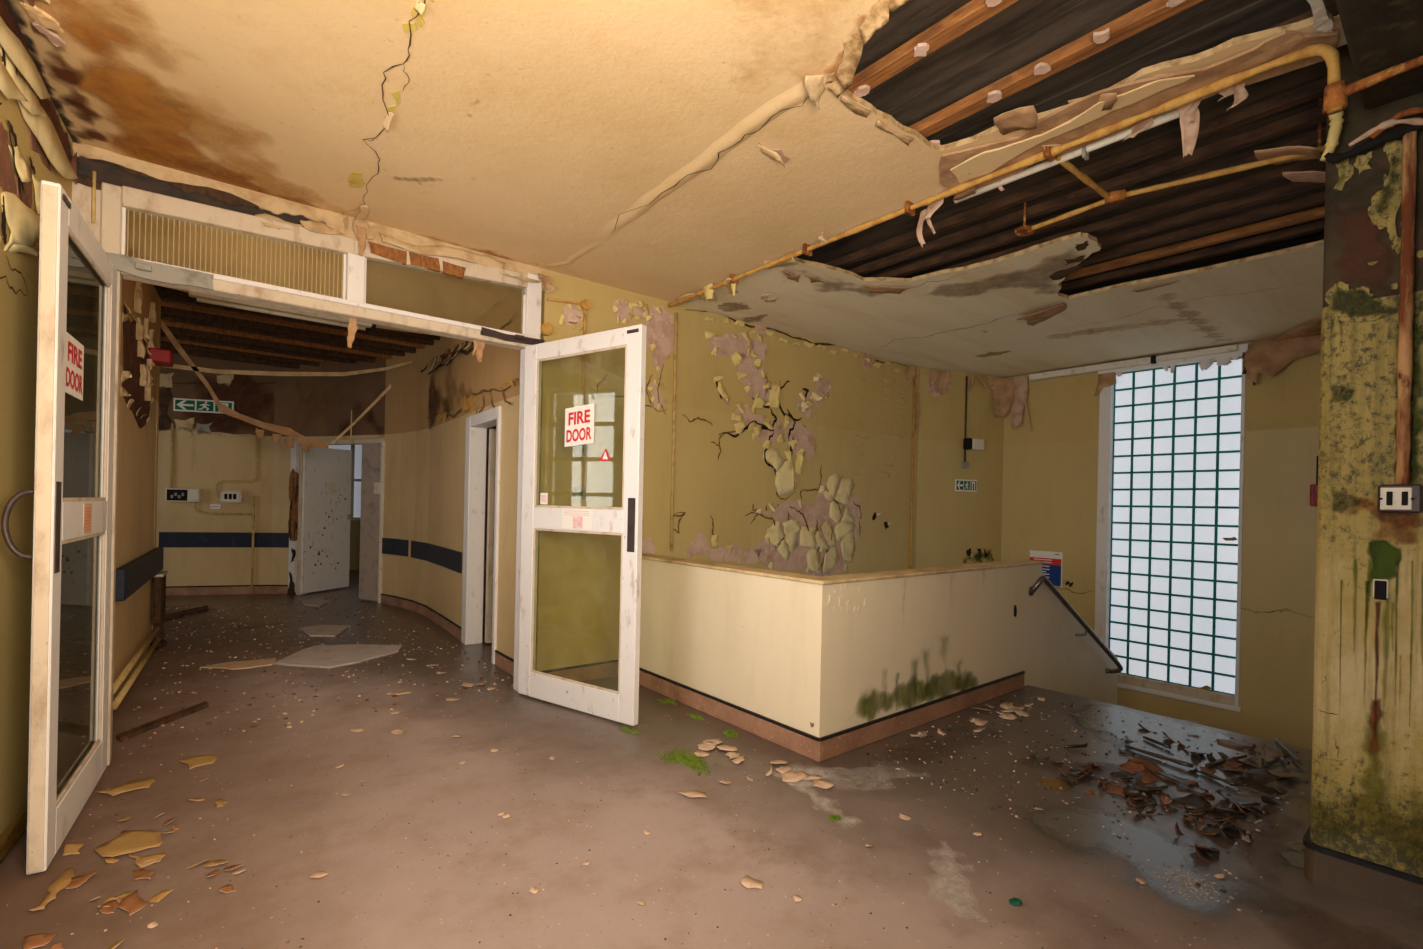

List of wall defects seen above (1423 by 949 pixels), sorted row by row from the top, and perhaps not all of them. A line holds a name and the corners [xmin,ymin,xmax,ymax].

peeling [0,48,51,260]
water stain [4,0,325,227]
peeling [70,152,558,293]
crack [342,0,434,220]
spalling [804,0,914,146]
spalling [937,241,1089,295]
peeling [916,0,1338,248]
peeling [1325,140,1423,323]
peeling [121,281,276,439]
peeling [420,340,518,425]
peeling [613,277,910,576]
water stain [1333,387,1353,401]